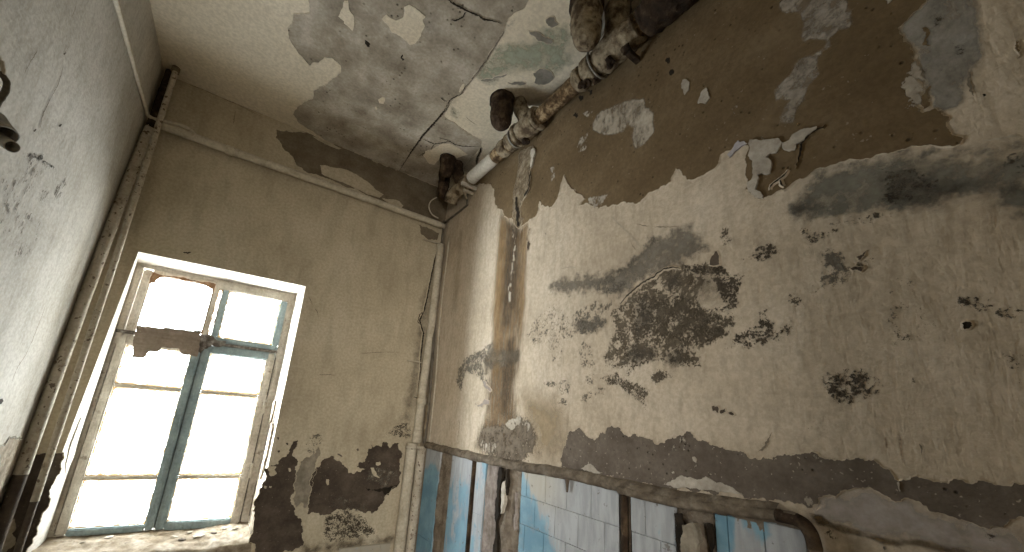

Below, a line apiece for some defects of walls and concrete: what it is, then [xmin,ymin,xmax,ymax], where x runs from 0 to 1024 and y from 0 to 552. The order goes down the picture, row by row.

spalling [275,0,564,240]
crack [399,0,504,171]
flaking render [475,0,966,229]
water stain [790,146,1024,292]
crack [412,248,437,399]
water stain [527,226,792,408]
water stain [823,368,883,404]
flaking render [0,417,82,552]
flaking render [248,395,403,552]
spalling [674,508,800,552]
flaking render [560,425,1024,529]